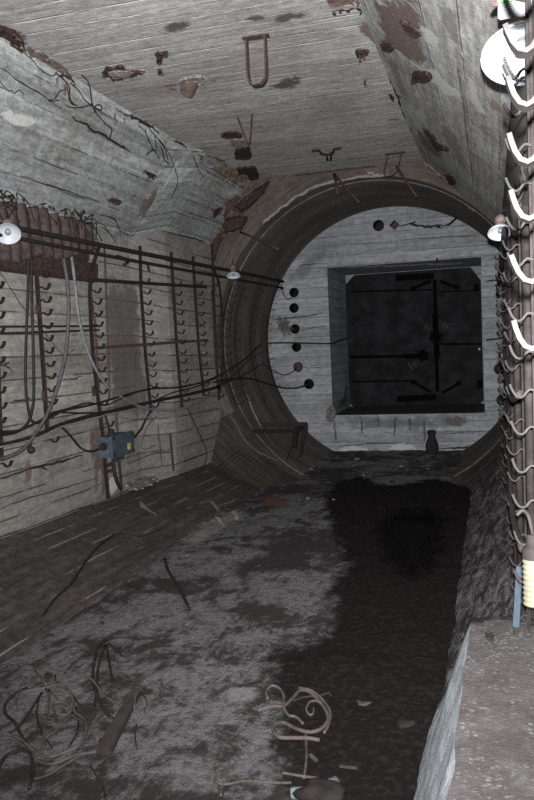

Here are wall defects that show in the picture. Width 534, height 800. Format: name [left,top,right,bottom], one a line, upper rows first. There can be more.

spalling [0,25,76,95]
spalling [101,50,177,91]
spalling [355,48,369,64]
peeling [374,0,433,85]
crack [1,68,131,153]
spalling [422,125,449,152]
spalling [197,131,280,262]
crack [398,221,471,240]